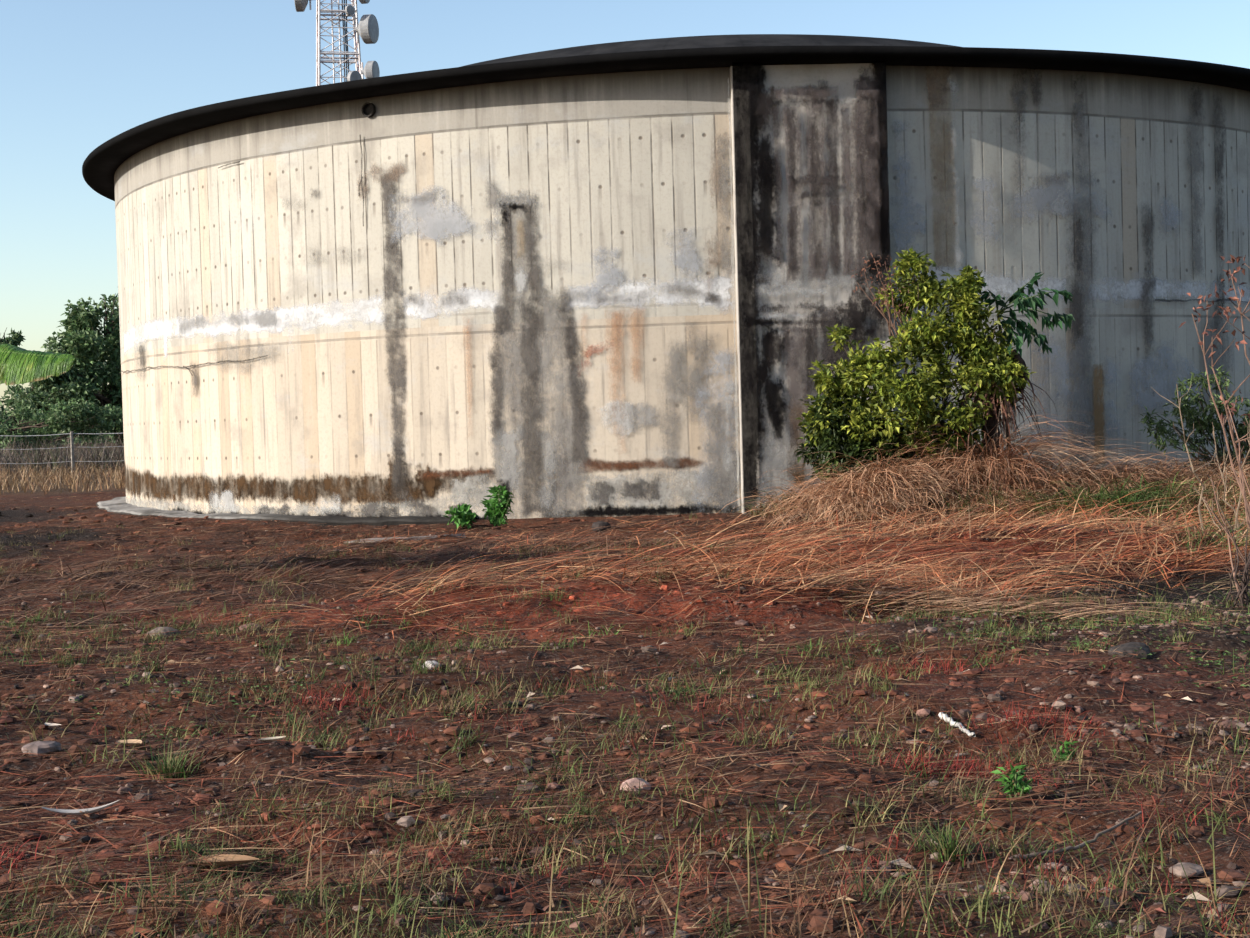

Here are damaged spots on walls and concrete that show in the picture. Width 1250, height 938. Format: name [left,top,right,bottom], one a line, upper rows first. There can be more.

water stain [124,166,587,519]
water stain [602,61,961,514]
water stain [1012,69,1119,459]
water stain [1106,90,1231,414]